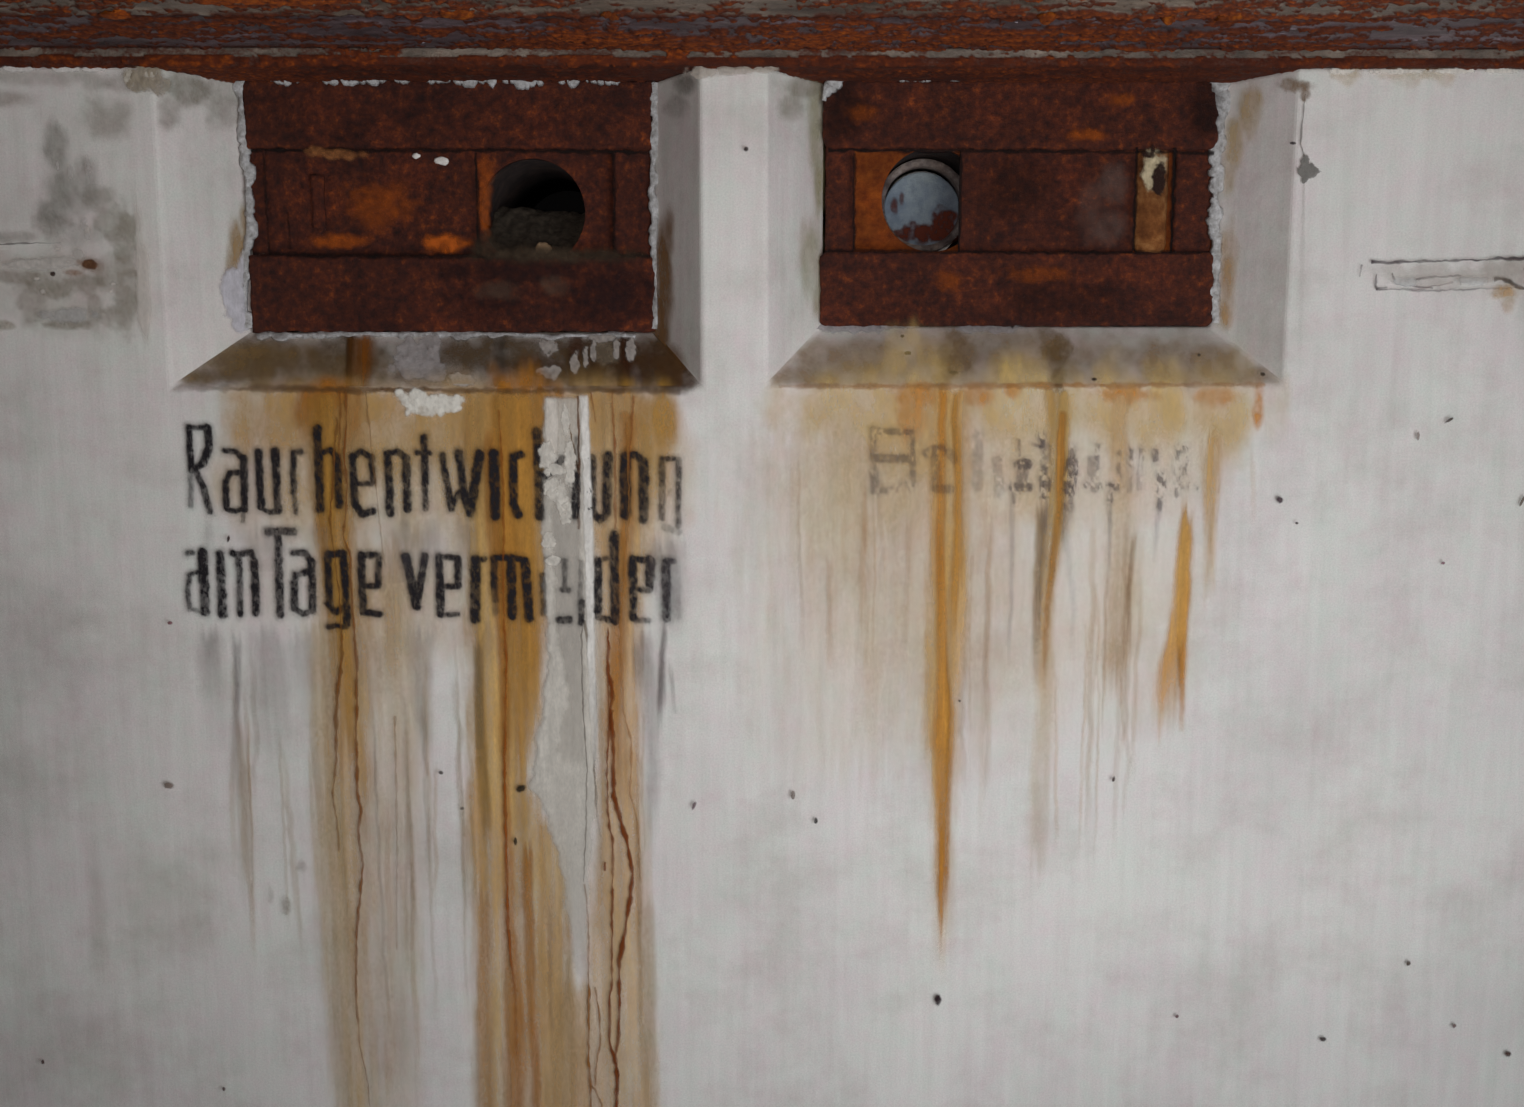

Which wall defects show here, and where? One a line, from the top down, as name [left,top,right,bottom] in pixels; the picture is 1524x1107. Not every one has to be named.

corrosion [229,225,243,269]
corrosion [264,336,397,912]
corrosion [310,147,365,160]
crack [329,392,370,1053]
corrosion [410,219,694,1107]
crack [587,561,634,1107]
corrosion [893,210,958,244]
corrosion [823,336,1071,921]
corrosion [1097,378,1184,433]
corrosion [1161,510,1192,701]